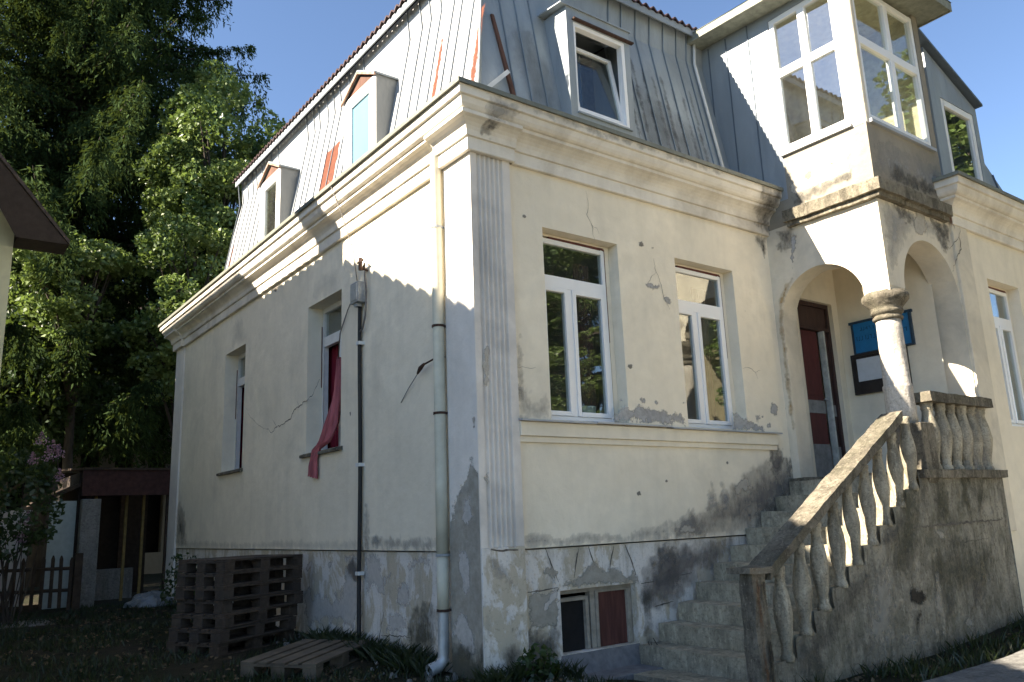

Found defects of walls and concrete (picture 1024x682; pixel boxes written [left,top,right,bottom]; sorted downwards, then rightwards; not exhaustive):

damp [757,191,780,253]
peeling [614,398,685,425]
damp [663,449,792,532]
peeling [304,555,362,630]
peeling [450,457,488,669]
damp [643,545,719,607]